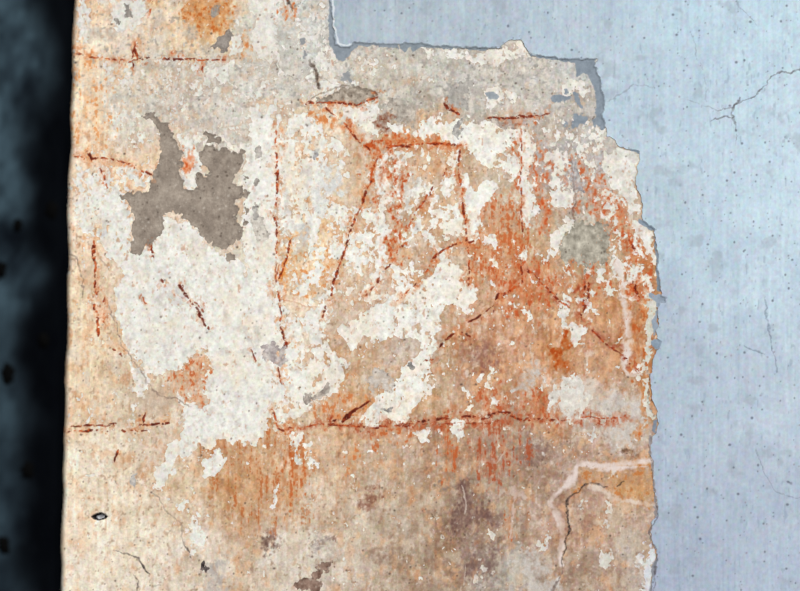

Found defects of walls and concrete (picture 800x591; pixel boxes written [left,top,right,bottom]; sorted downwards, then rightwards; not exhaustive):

spalling [63,0,667,591]
rust [192,89,656,539]
crack [551,480,625,591]
crack [685,30,800,141]